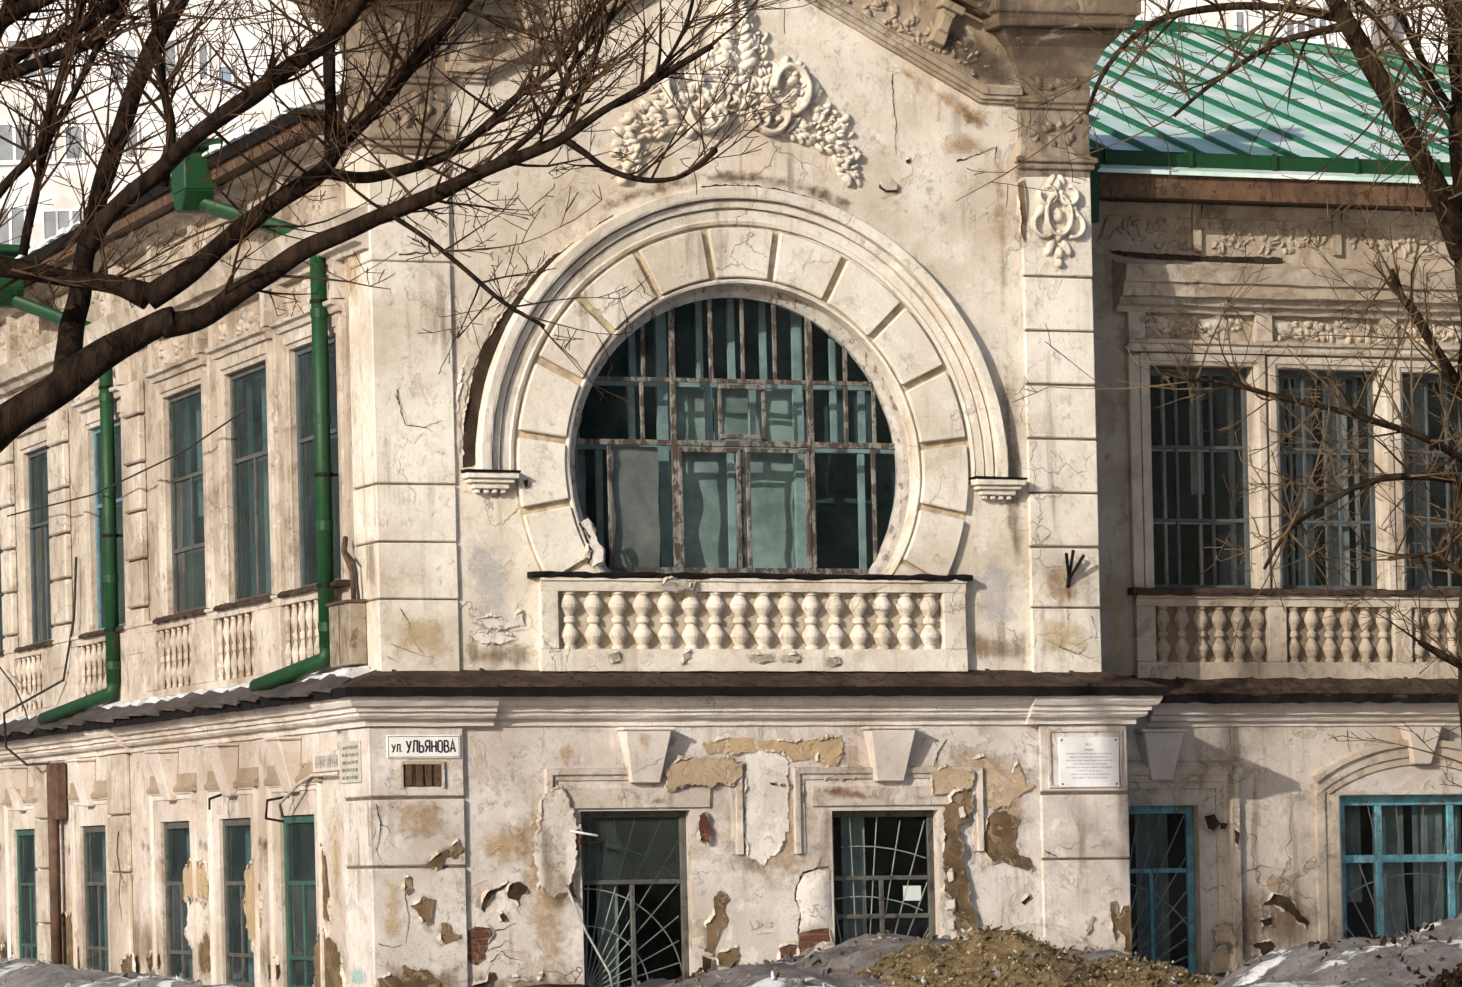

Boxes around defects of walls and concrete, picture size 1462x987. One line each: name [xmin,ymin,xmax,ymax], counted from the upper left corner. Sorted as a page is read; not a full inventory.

peeling [471,608,525,646]
peeling [181,857,211,979]
peeling [243,859,263,953]
spalling [267,954,280,983]
peeling [313,839,347,987]
peeling [401,785,583,987]
peeling [663,733,861,865]
crack [794,859,829,934]
peeling [928,753,1036,933]
peeling [1210,892,1309,975]